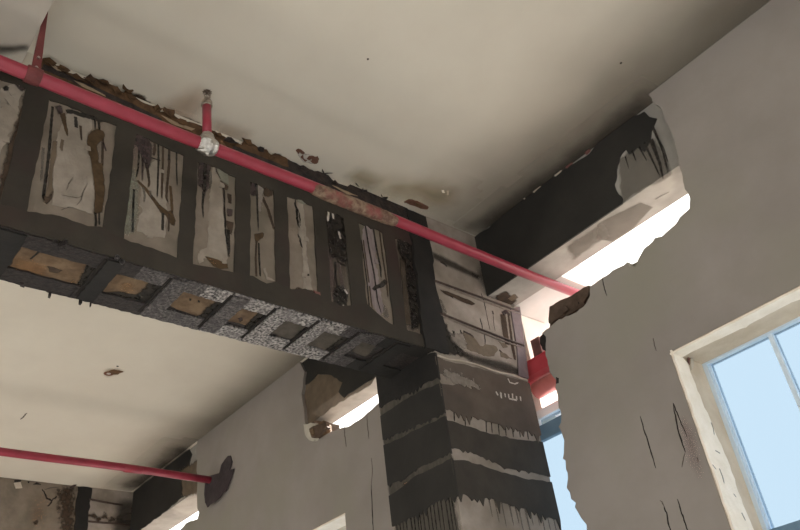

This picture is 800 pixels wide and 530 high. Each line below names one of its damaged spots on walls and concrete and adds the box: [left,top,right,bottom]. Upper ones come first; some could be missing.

peeling [0,84,24,153]
flaking render [41,57,202,136]
peeling [52,114,95,214]
peeling [137,160,167,238]
peeling [198,167,229,264]
flaking render [212,130,429,219]
peeling [362,226,384,315]
flaking render [548,286,590,325]
flaking render [304,421,332,442]
crack [640,416,656,468]
crack [673,403,699,465]
crack [661,499,688,530]